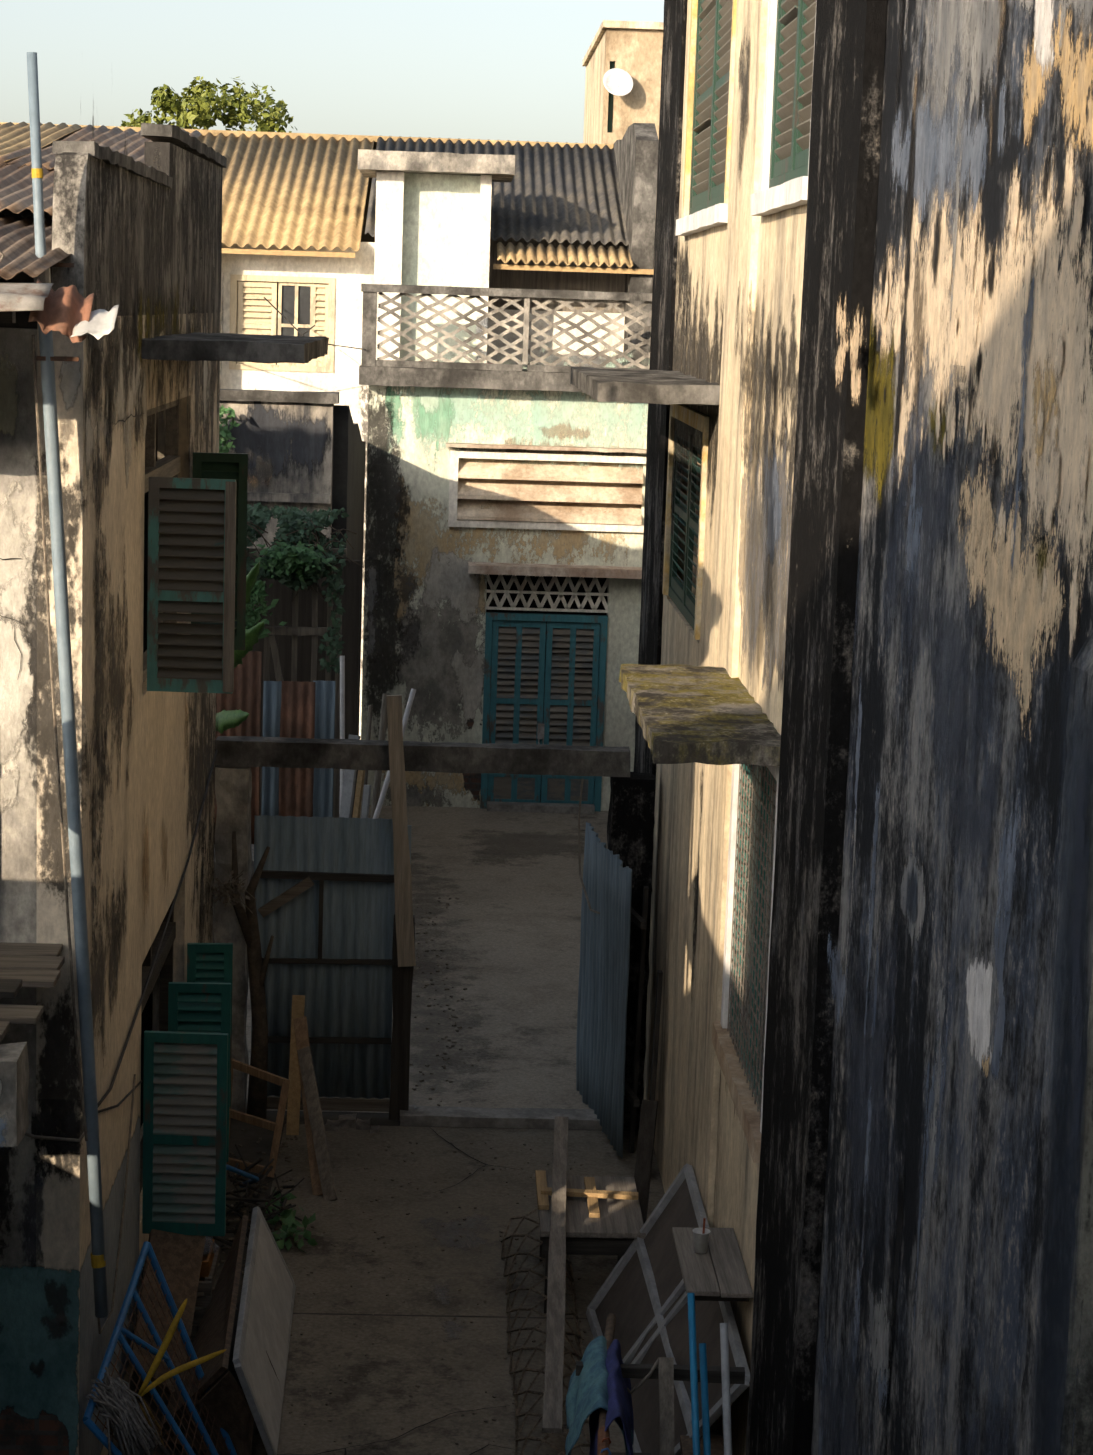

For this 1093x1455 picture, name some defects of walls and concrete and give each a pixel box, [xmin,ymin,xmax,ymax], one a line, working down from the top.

peeling [835,3,1093,742]
water stain [0,141,331,1267]
water stain [359,386,455,738]
spalling [0,1405,69,1455]
spalling [41,1281,71,1339]